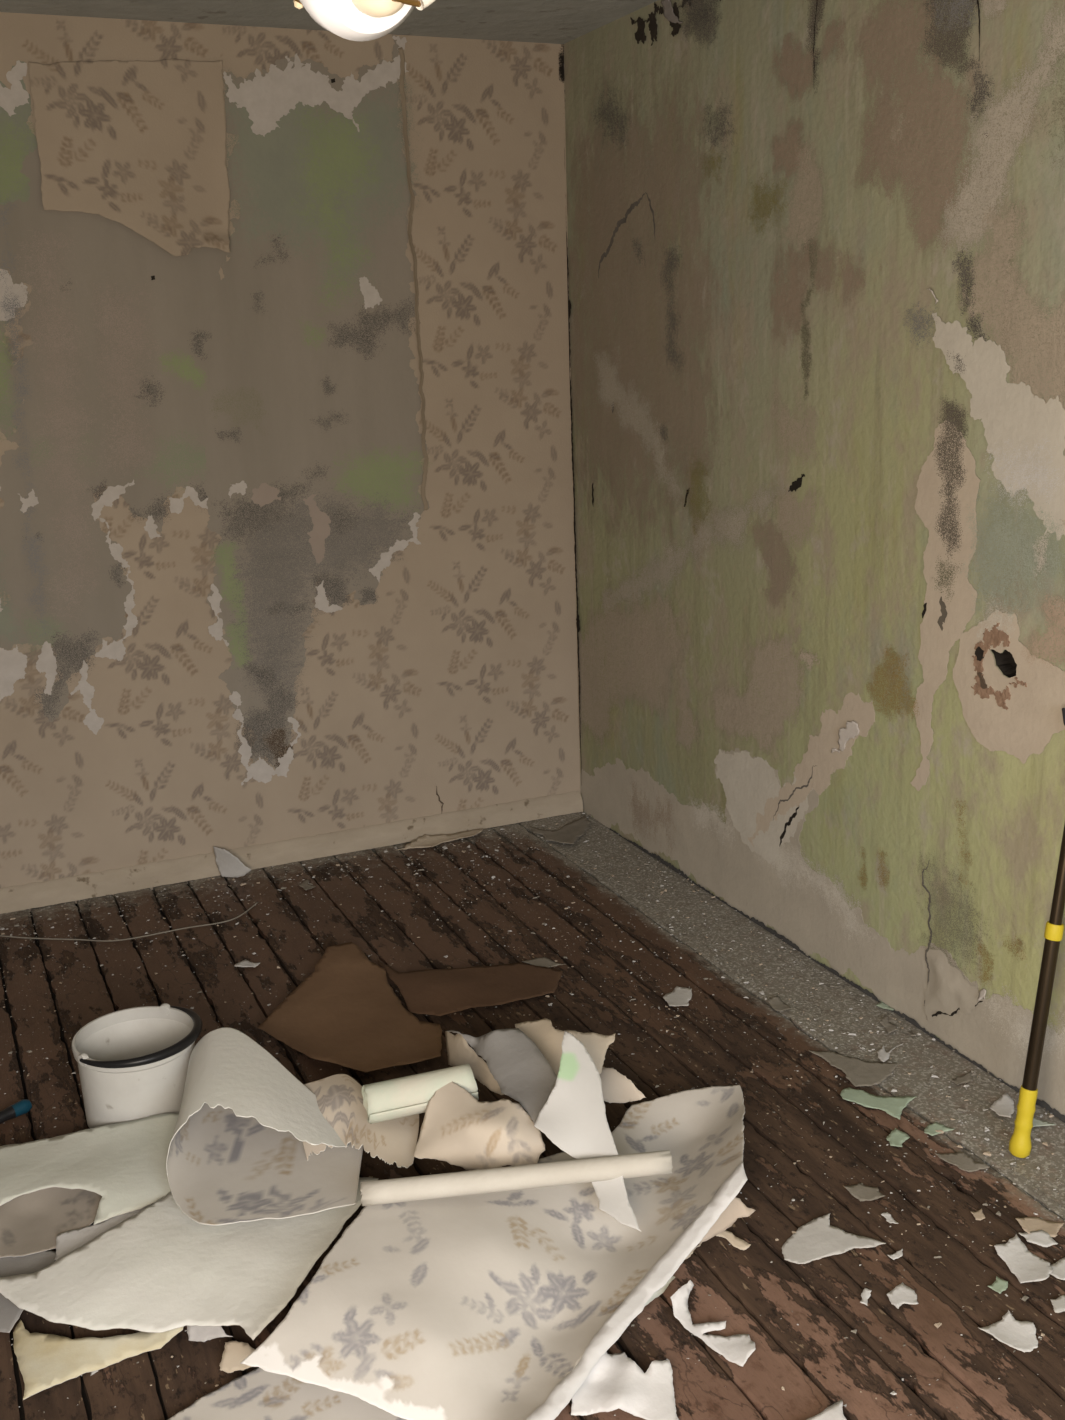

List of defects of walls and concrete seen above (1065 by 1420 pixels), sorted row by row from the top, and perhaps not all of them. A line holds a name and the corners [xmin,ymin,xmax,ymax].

peeling [29,59,230,256]
spalling [630,0,722,50]
water stain [804,0,826,93]
water stain [918,0,995,138]
water stain [799,235,819,399]
water stain [190,462,422,767]
crack [565,193,655,786]
peeling [904,289,1065,791]
crack [748,692,875,847]
spalling [580,748,1065,1115]